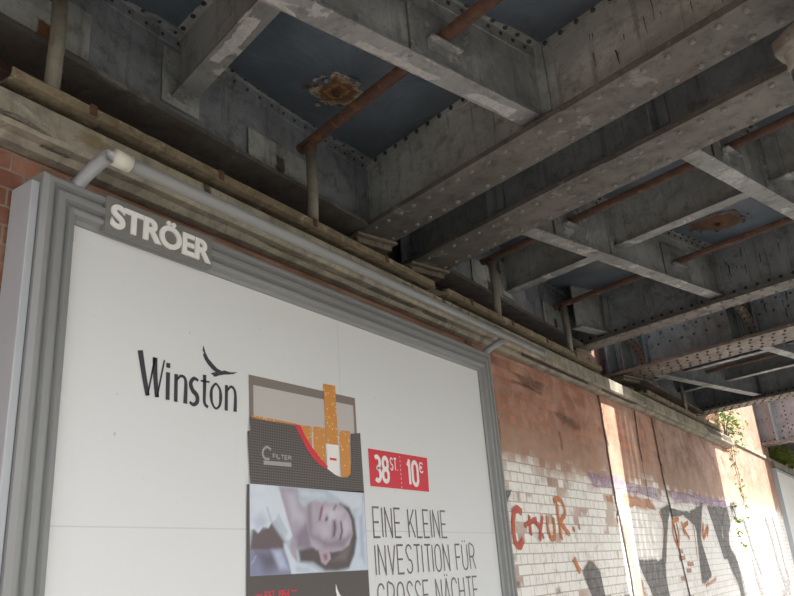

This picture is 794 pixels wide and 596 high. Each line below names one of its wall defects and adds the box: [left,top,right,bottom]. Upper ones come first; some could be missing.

peeling [265,0,296,17]
rust [301,72,364,107]
crack [597,395,635,596]
crack [634,410,690,596]